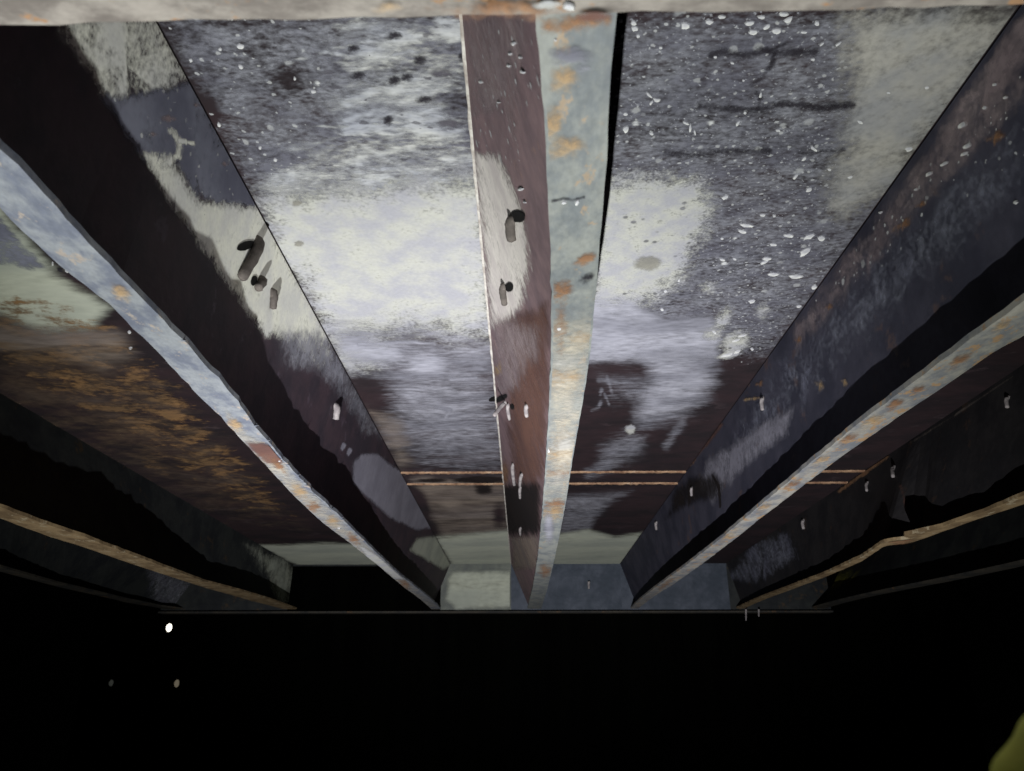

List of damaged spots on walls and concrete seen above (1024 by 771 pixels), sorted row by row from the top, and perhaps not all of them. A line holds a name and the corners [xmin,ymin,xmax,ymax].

rust [479,2,537,15]
rust [545,12,608,30]
crack [709,44,818,70]
crack [698,92,855,112]
crack [669,149,771,157]
leakage [66,16,536,457]
efflorescence [547,5,1024,485]
leakage [0,208,108,331]
rust [0,297,363,550]